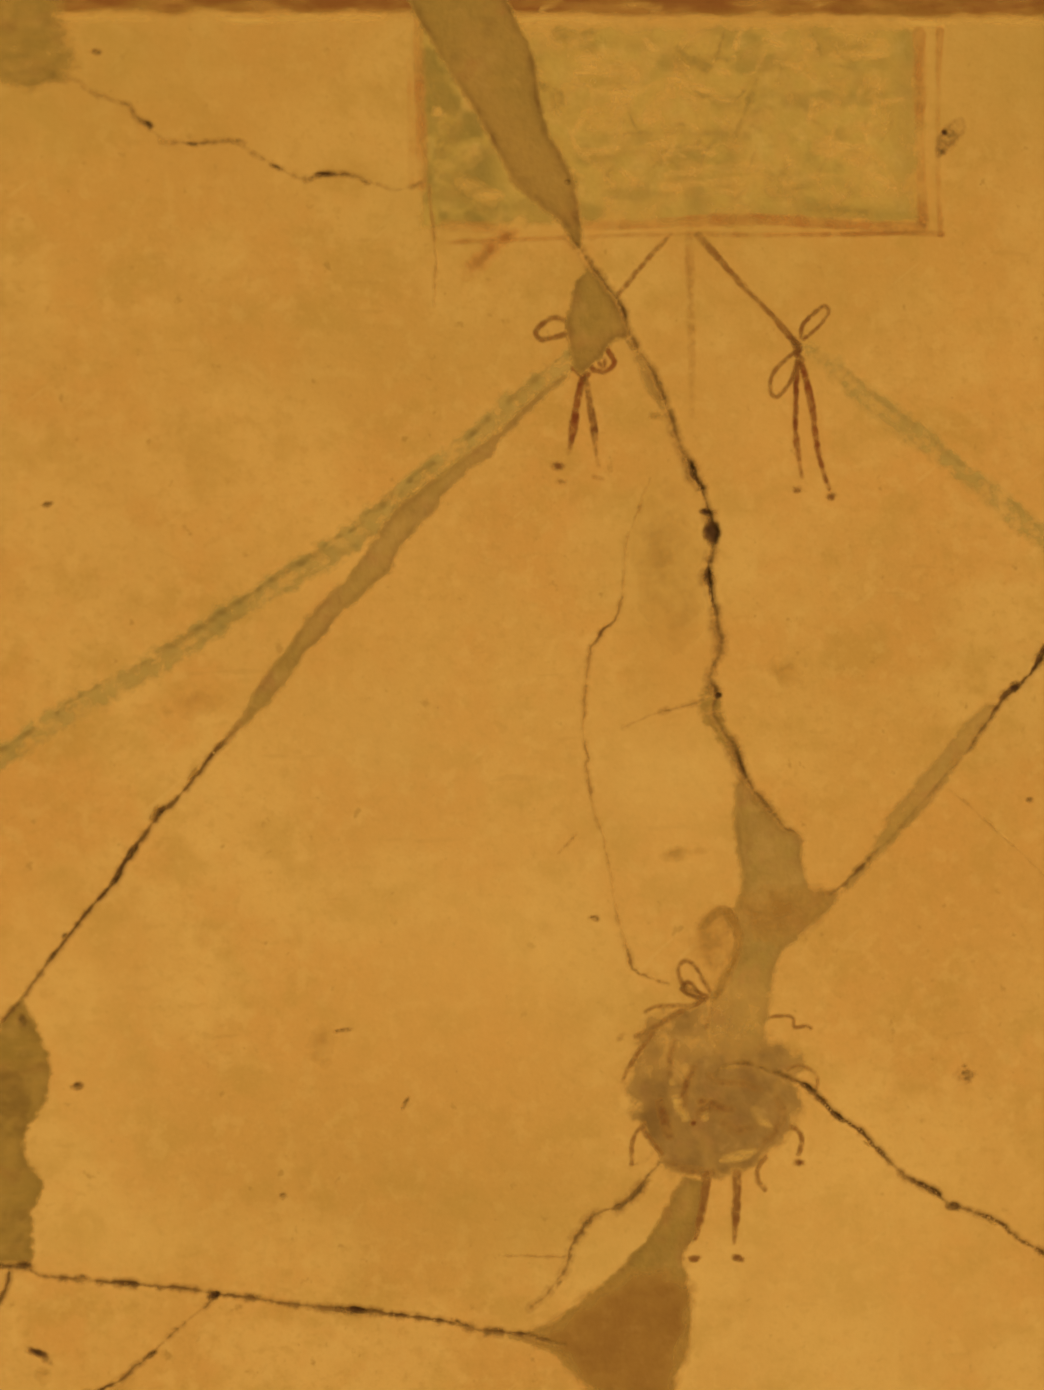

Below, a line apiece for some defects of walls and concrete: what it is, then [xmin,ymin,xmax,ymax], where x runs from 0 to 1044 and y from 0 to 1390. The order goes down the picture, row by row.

crack [125,103,239,145]
crack [271,164,366,182]
crack [573,242,793,832]
crack [936,645,1044,787]
crack [0,738,227,1024]
crack [829,825,902,894]
crack [627,949,665,983]
leakage [701,892,824,999]
crack [714,1062,1044,1256]
crack [0,1164,659,1345]
crack [98,1328,178,1390]
leakage [535,1270,690,1390]